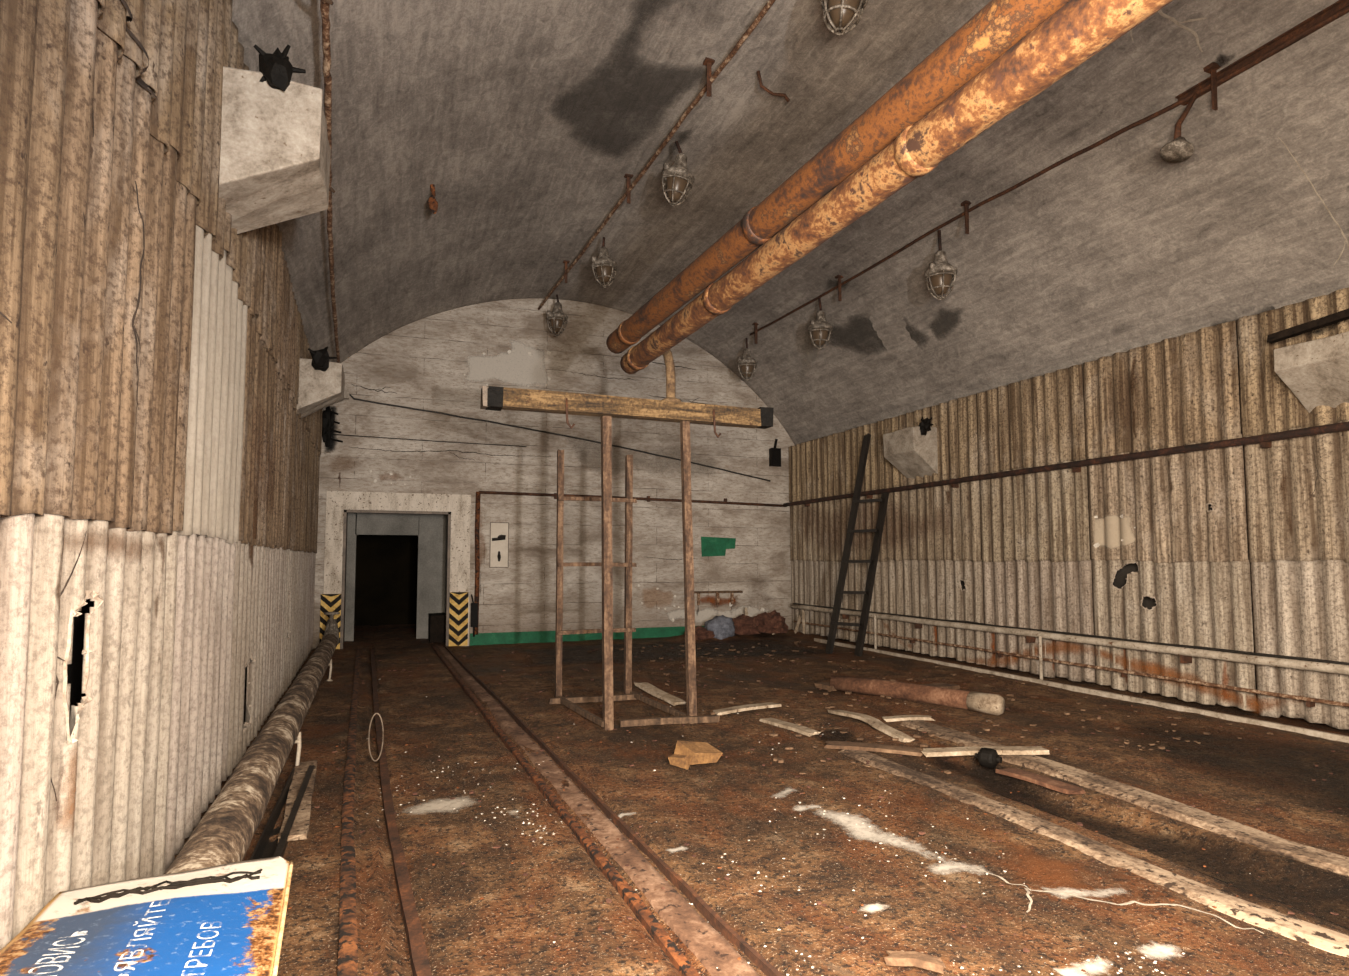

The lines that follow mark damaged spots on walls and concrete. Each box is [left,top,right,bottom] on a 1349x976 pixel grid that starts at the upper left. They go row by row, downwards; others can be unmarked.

leakage [554,0,707,155]
spalling [62,590,104,744]